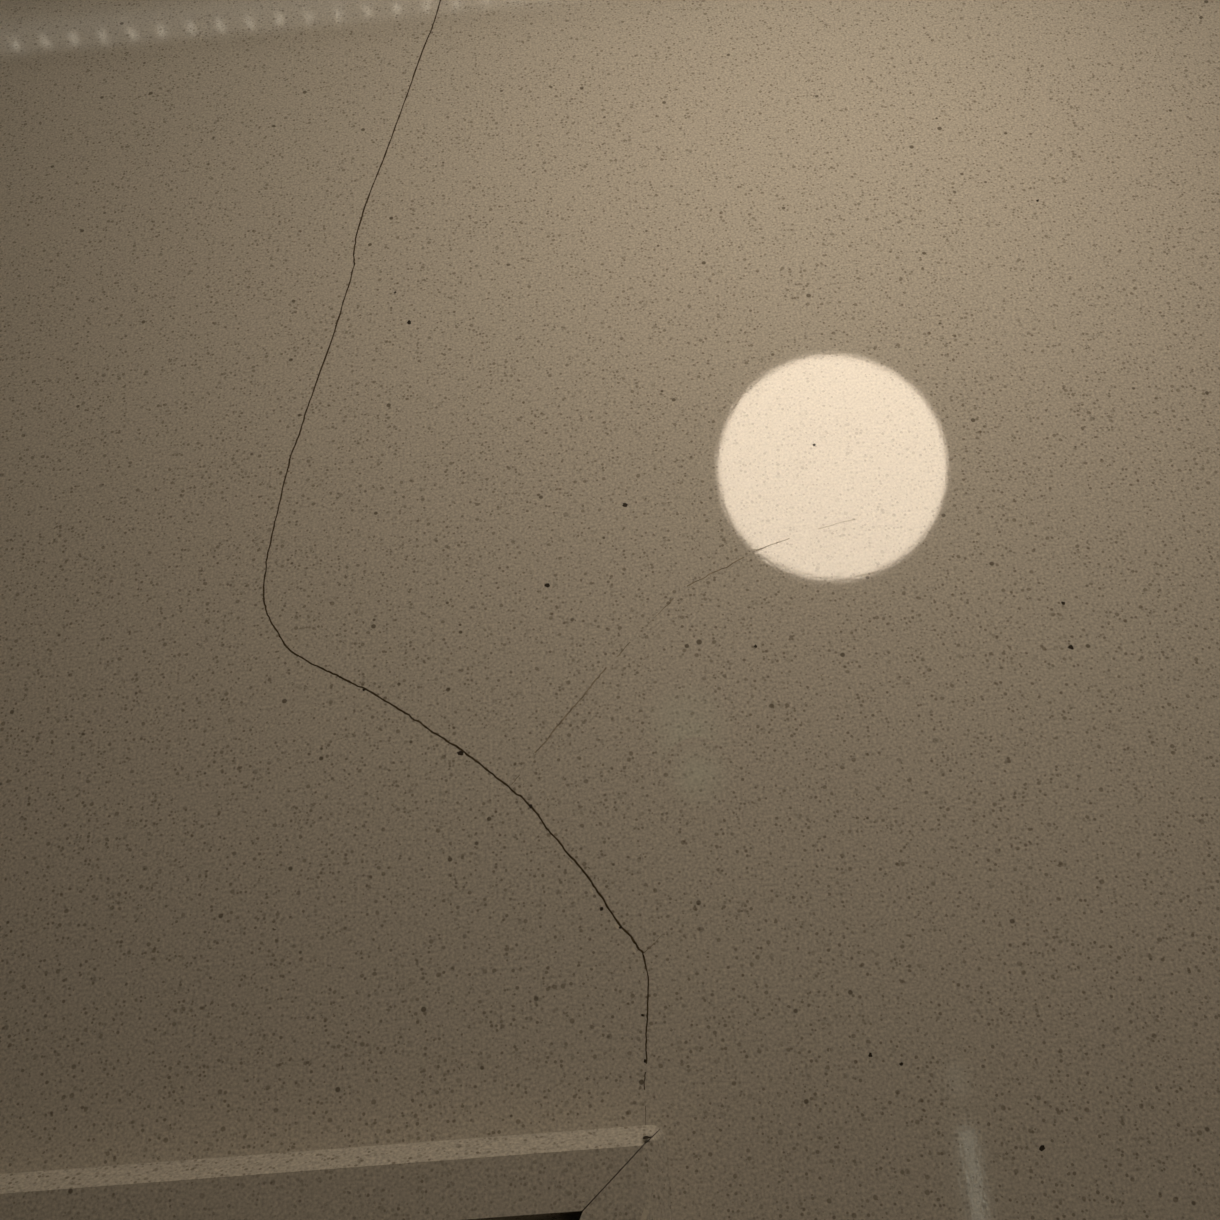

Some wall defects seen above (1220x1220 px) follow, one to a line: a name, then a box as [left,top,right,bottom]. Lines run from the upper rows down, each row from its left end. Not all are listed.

crack [263,0,790,1125]